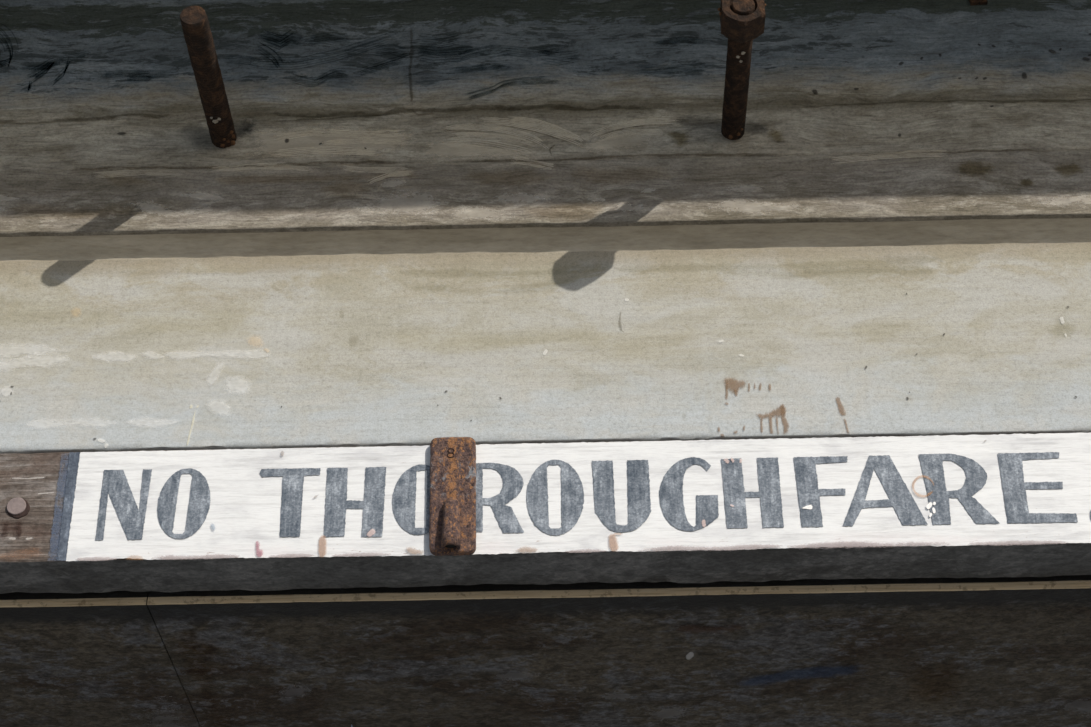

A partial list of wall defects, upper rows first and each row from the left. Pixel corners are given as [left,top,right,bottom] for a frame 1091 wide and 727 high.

corrosion [726,379,771,404]
corrosion [759,406,788,433]